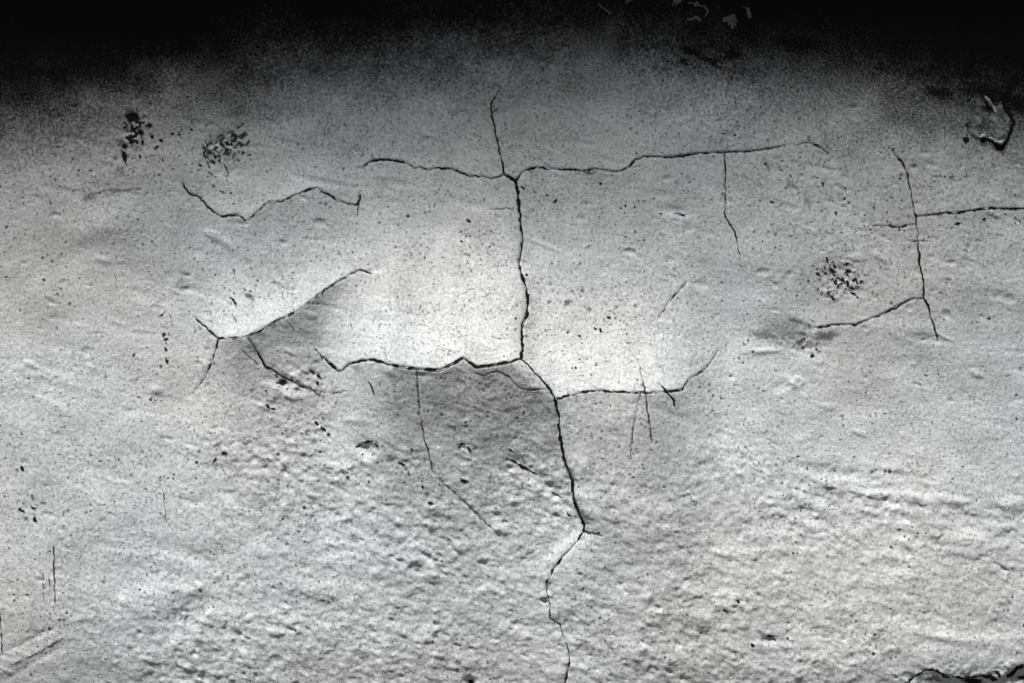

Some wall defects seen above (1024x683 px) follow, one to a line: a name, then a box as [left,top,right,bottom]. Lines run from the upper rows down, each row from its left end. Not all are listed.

peeling [962,73,1019,151]
crack [816,150,1024,337]
crack [182,89,829,683]